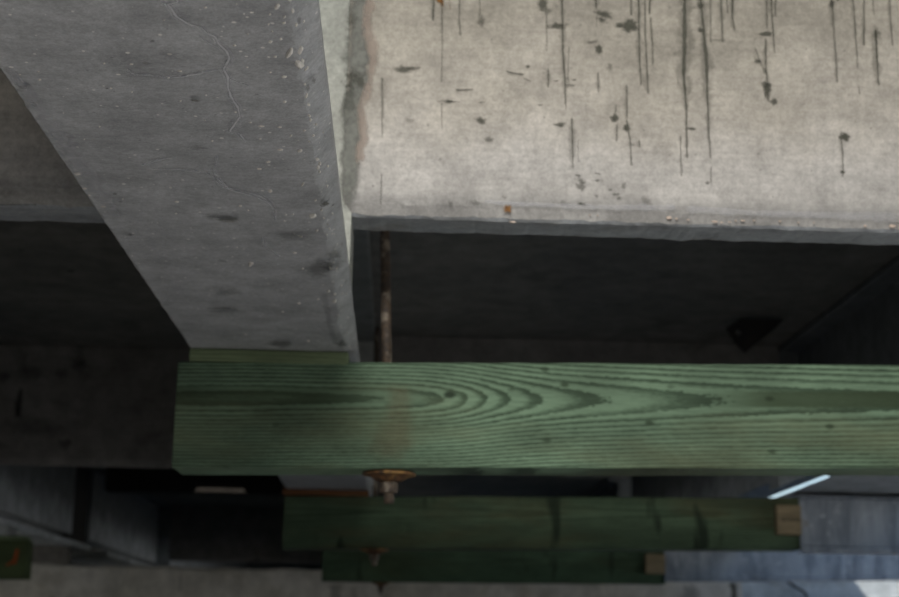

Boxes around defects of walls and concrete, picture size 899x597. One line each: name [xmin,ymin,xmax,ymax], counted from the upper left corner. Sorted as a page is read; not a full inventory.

crack [160,0,246,141]
water stain [340,0,375,203]
water stain [552,0,566,104]
water stain [595,0,653,88]
water stain [610,114,640,165]
water stain [680,0,694,147]
water stain [698,0,735,158]
water stain [755,0,777,105]